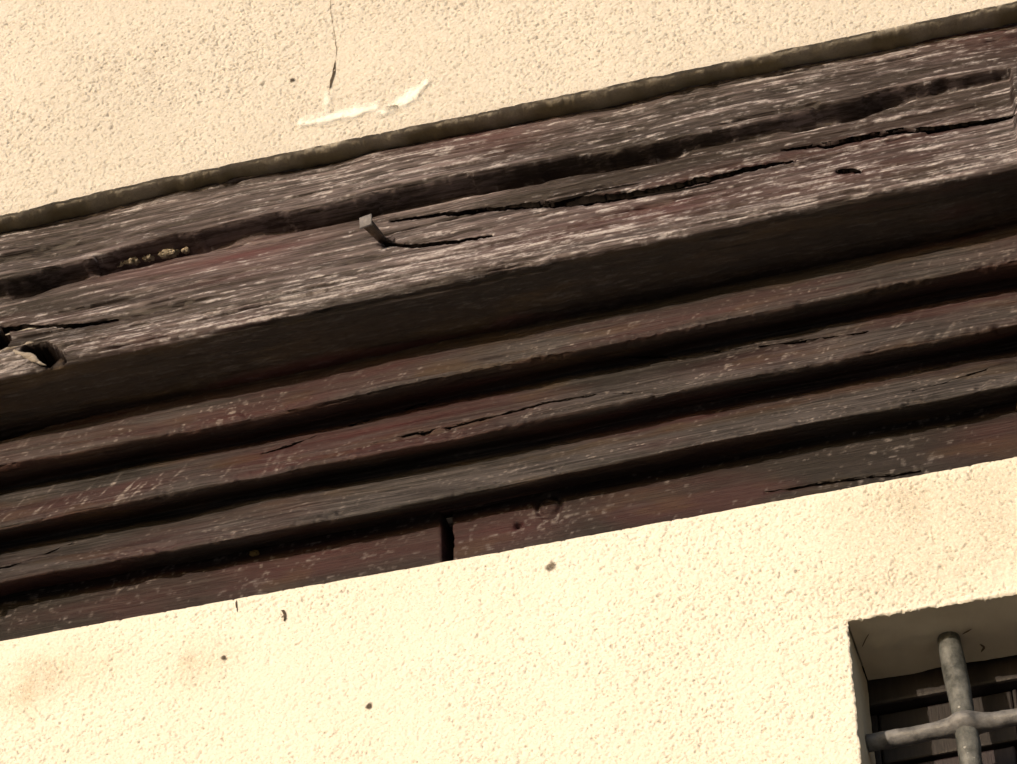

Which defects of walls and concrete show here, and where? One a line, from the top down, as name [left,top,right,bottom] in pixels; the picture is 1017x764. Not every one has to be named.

crack [326,2,337,114]
crack [383,115,1015,248]
crack [2,319,119,334]
crack [624,331,869,359]
crack [261,393,633,454]